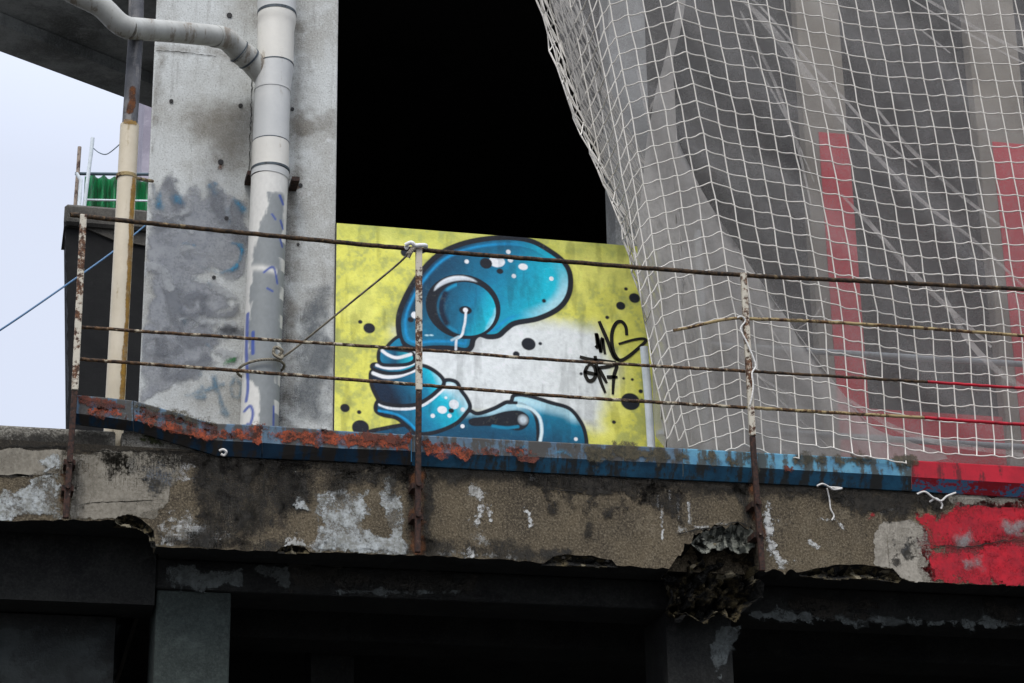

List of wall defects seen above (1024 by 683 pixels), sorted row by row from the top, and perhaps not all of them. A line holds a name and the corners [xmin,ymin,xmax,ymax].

corrosion [77,177,539,463]
peeling [0,454,62,521]
spalling [115,516,157,548]
peeling [166,477,408,593]
water stain [0,430,949,569]
spalling [661,523,765,680]